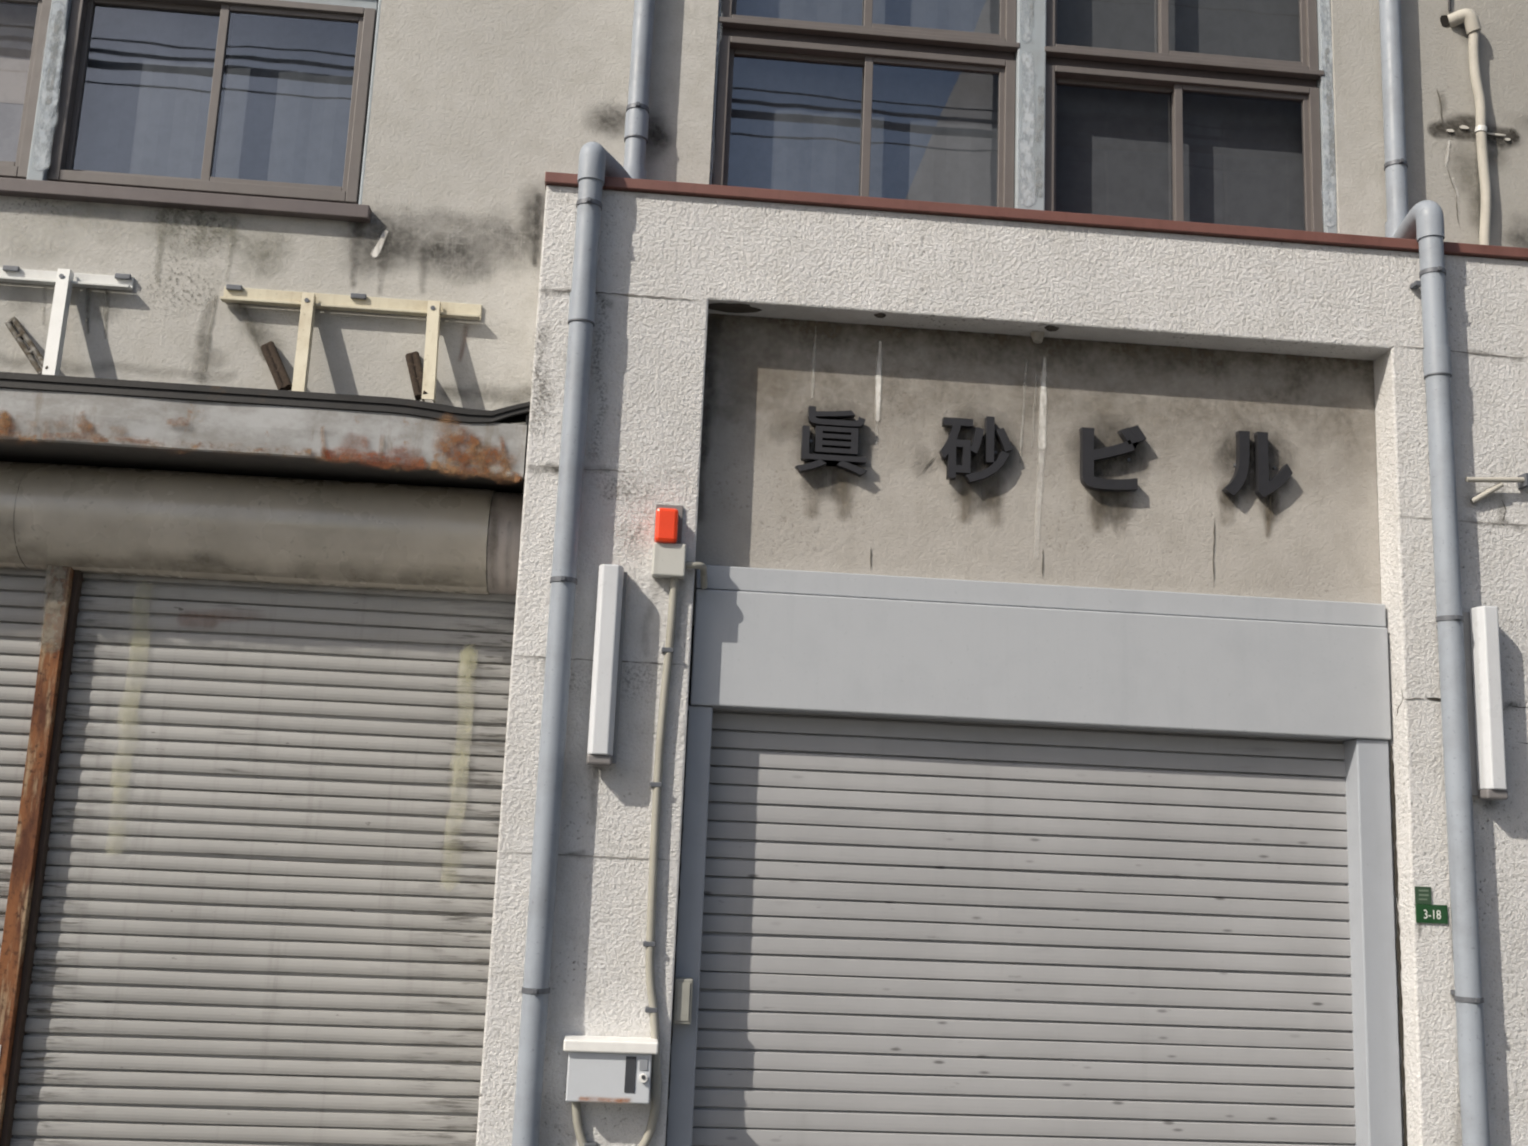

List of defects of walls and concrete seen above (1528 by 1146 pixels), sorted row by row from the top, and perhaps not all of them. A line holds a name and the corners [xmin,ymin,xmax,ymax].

water stain [356,222,465,263]
rust [0,412,61,441]
rust [295,418,521,482]
water stain [1021,357,1046,465]